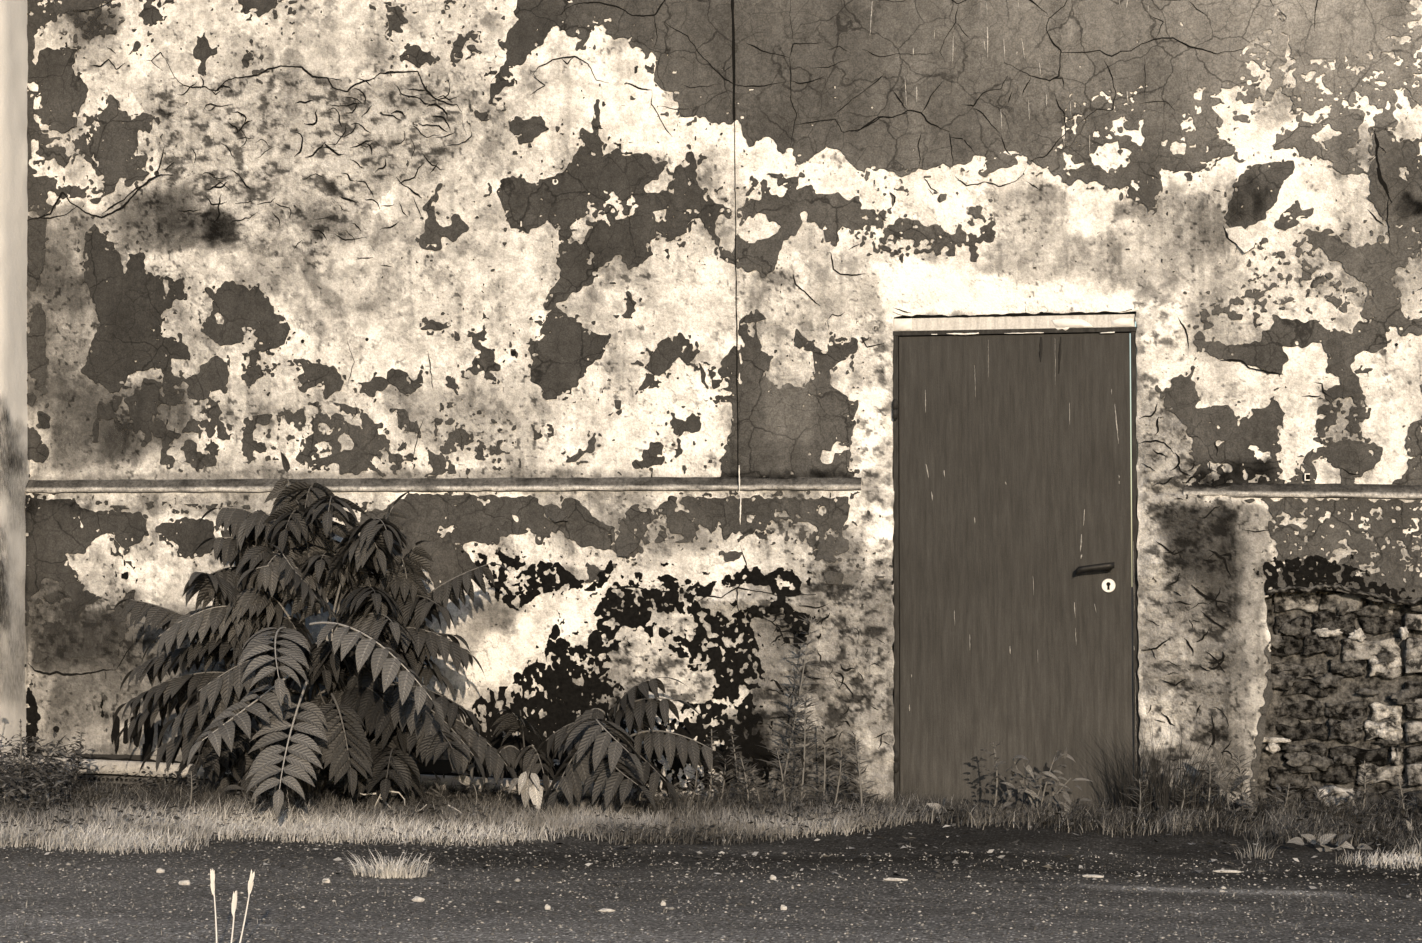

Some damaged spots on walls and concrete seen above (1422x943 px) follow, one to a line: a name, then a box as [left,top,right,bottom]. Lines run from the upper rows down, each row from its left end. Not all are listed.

crack [27,46,472,267]
peeling [1090,116,1145,173]
peeling [1161,87,1206,155]
peeling [1386,47,1422,162]
crack [531,0,1242,478]
peeling [1385,226,1422,320]
crack [1221,359,1328,398]
leakage [0,406,21,471]
peeling [1312,456,1341,484]
leakage [0,532,9,627]
peeling [1321,499,1422,582]
peeling [24,492,276,762]